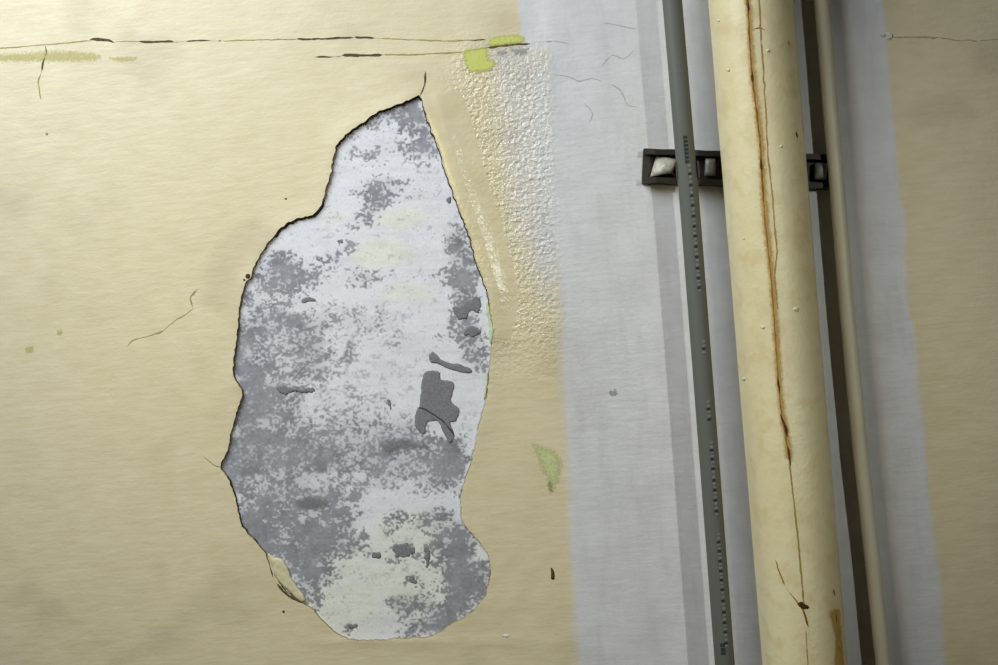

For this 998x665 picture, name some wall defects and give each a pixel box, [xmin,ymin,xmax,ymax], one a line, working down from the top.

crack [0,36,565,99]
crack [552,23,636,122]
crack [128,289,197,345]
peeling [221,95,494,641]
corrosion [830,610,844,665]